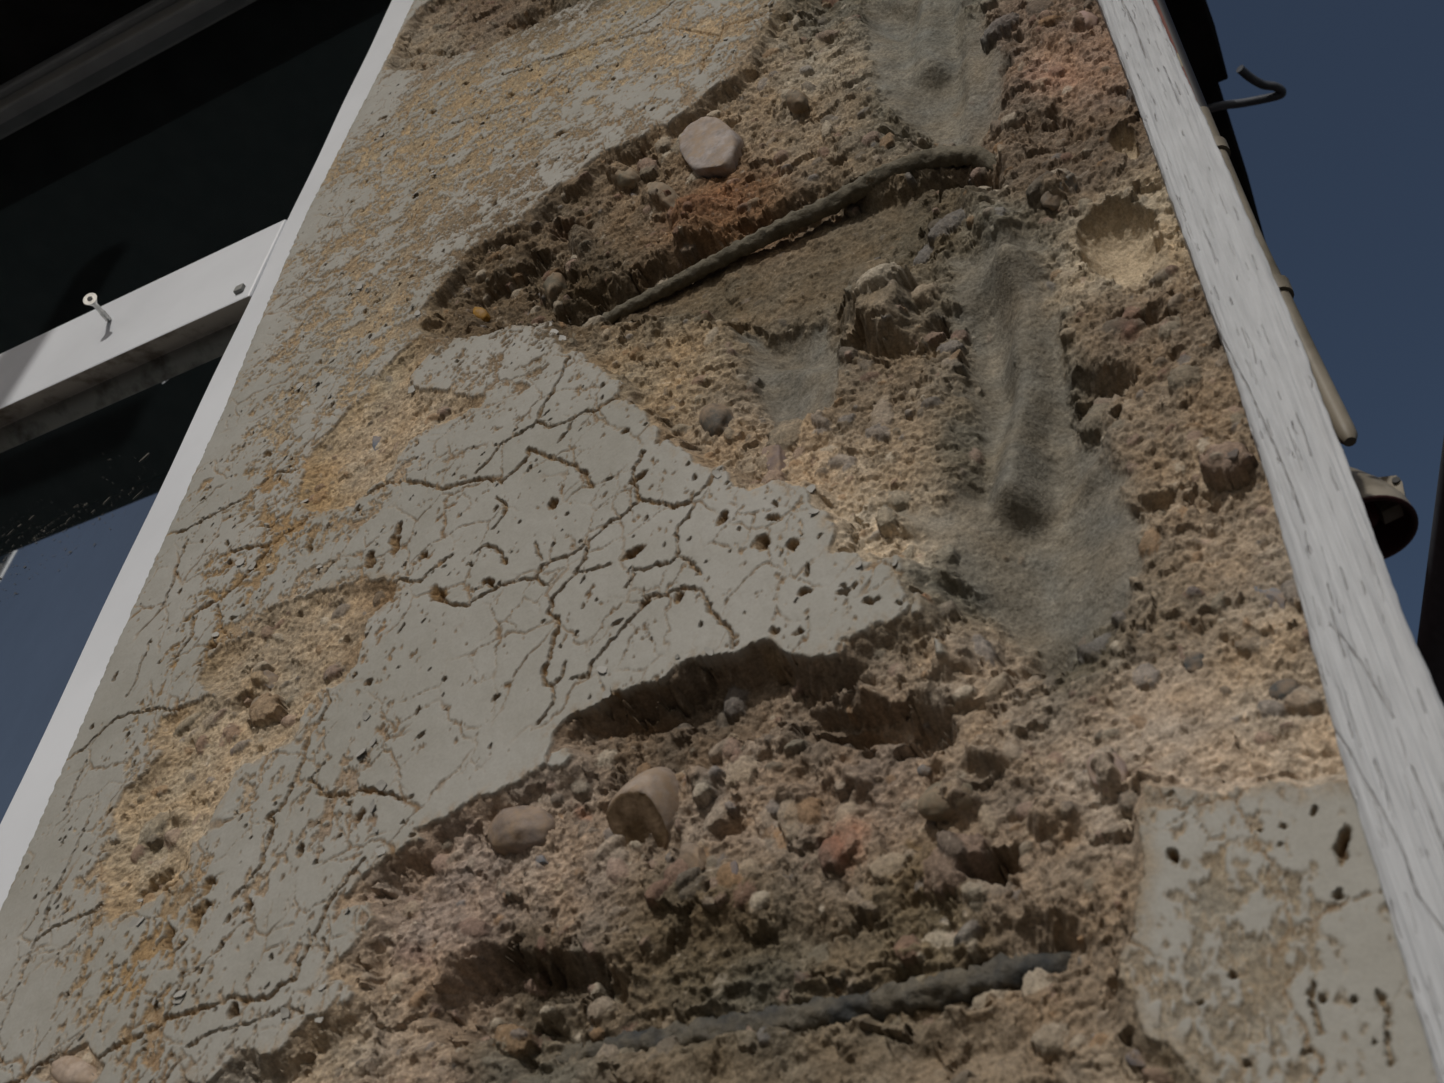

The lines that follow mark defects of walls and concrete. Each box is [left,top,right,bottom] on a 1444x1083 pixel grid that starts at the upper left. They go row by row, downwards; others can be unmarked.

peeling [383,520,416,558]
peeling [418,553,501,602]
crack [365,314,738,726]
peeling [619,515,647,574]
peeling [713,534,771,566]
peeling [779,536,799,555]
crack [0,468,312,1032]
crack [232,688,415,900]
peeling [211,715,404,956]
peeling [1333,826,1351,866]
crack [99,856,367,1083]
crack [6,1049,59,1083]